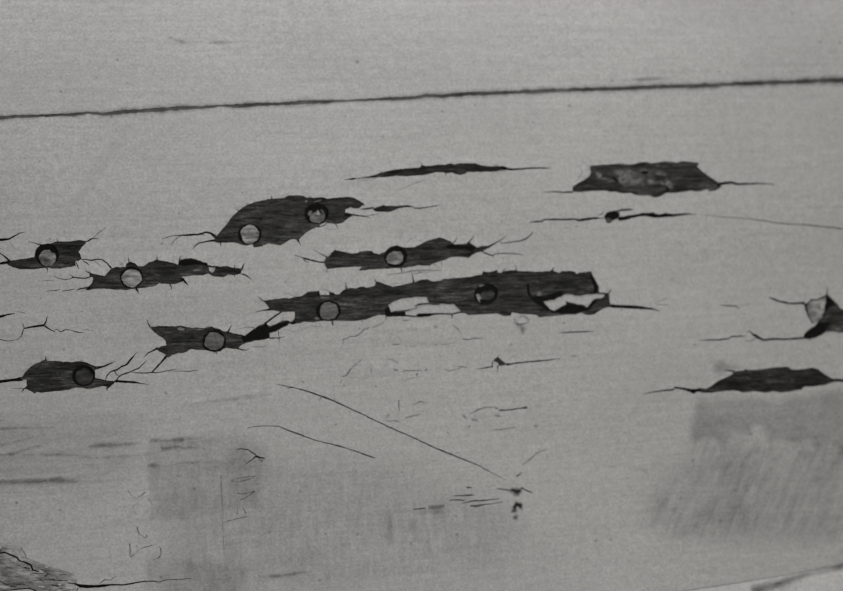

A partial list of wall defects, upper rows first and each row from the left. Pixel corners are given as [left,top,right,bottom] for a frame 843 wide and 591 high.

peeling [346,162,552,191]
peeling [549,161,774,198]
crack [529,208,843,229]
peeling [0,196,439,294]
crack [0,311,93,341]
peeling [0,233,668,393]
peeling [700,289,843,342]
peeling [645,367,843,394]
crack [236,448,265,464]
crack [249,426,375,458]
crack [277,384,547,510]
crack [0,547,192,591]